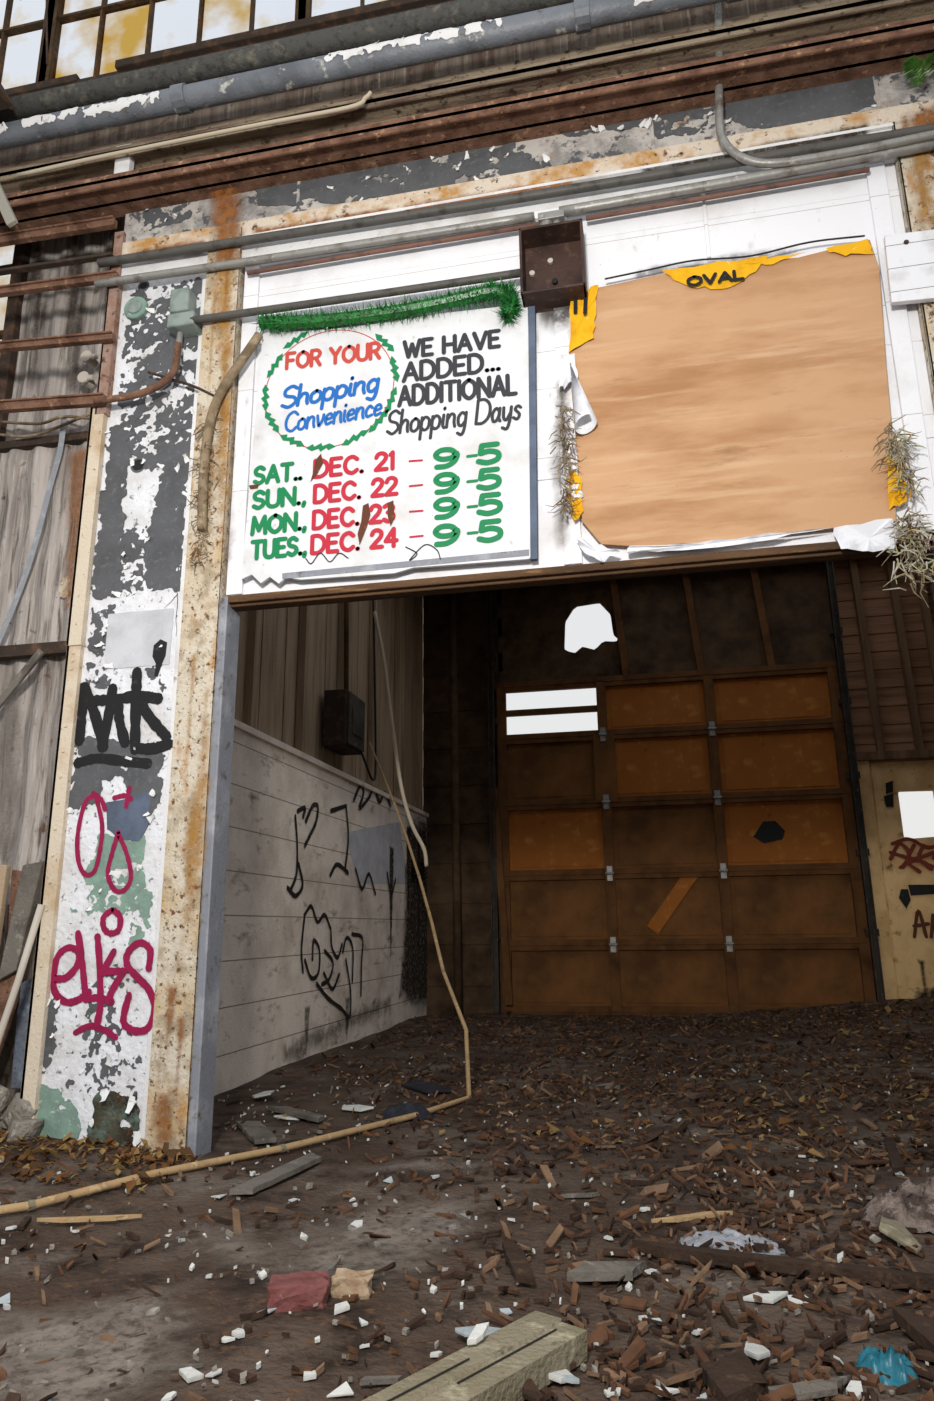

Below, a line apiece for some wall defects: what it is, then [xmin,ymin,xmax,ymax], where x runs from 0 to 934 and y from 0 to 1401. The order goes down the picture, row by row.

peeling [143,202,192,232]
corrosion [255,209,387,232]
peeling [255,142,552,207]
corrosion [405,180,572,211]
corrosion [644,124,867,172]
corrosion [904,108,934,128]
corrosion [141,187,240,472]
peeling [85,277,203,692]
peeling [66,736,167,945]
corrosion [185,777,205,892]
corrosion [167,988,182,1048]
peeling [37,964,142,1147]